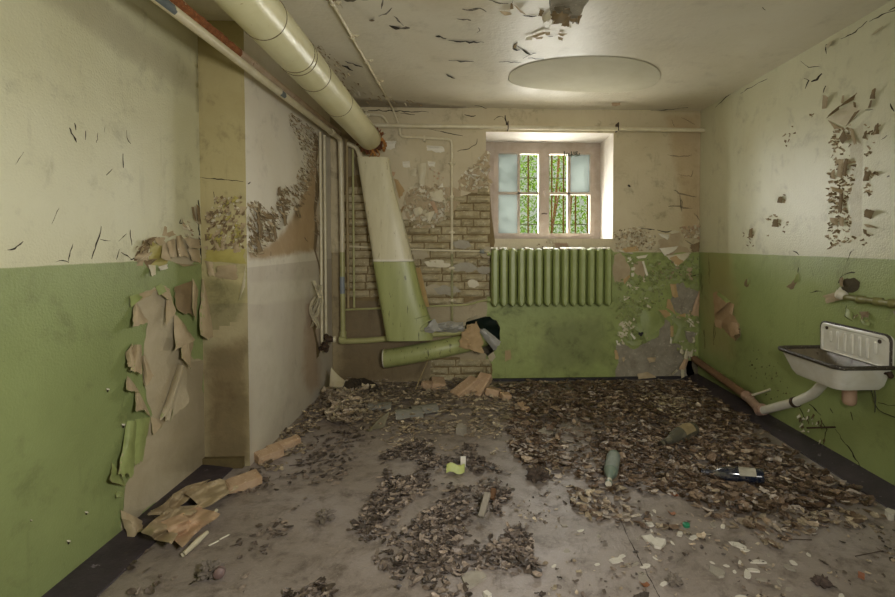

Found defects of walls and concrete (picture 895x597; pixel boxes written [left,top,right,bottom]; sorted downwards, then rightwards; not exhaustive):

peeling [500,0,589,28]
peeling [809,88,889,250]
peeling [110,113,320,537]
flaking render [339,175,380,305]
flaking render [392,142,505,381]
peeling [612,223,700,284]
peeling [614,283,700,379]
peeling [820,272,893,366]